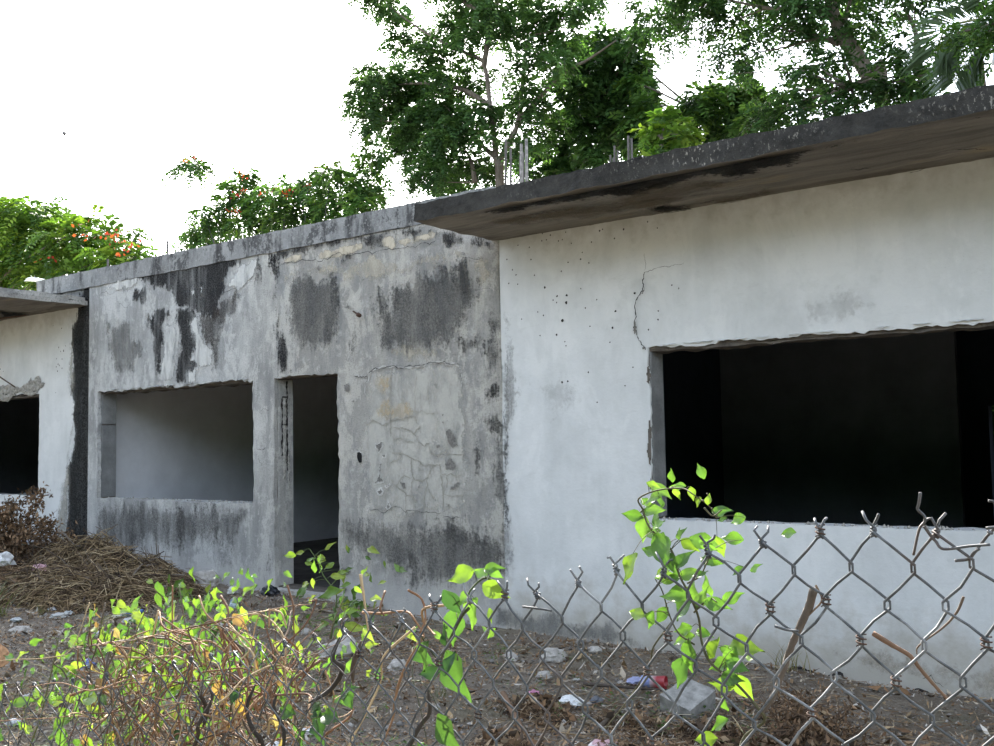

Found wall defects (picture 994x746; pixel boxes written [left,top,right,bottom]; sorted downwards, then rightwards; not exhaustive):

leakage [485,150,811,224]
leakage [107,259,241,383]
leakage [273,271,339,374]
leakage [255,234,382,280]
peeling [316,243,363,270]
peeling [382,232,436,249]
leakage [370,257,501,360]
crack [633,256,682,350]
flaking render [0,371,45,402]
leakage [58,288,242,546]
crack [354,361,467,519]
leakage [346,520,505,587]